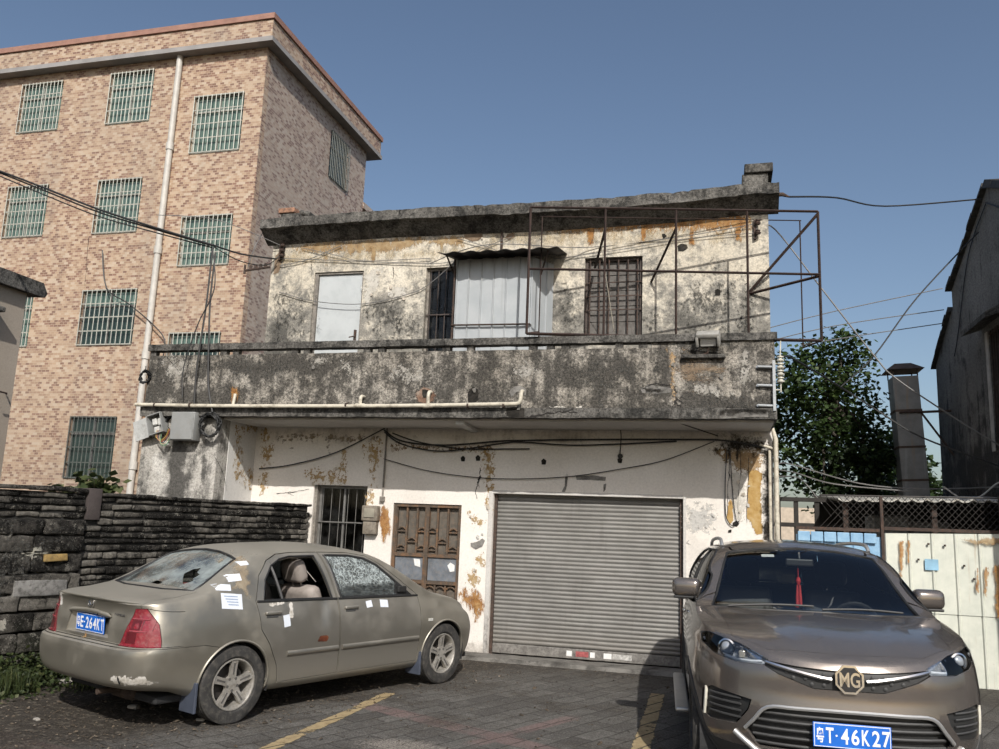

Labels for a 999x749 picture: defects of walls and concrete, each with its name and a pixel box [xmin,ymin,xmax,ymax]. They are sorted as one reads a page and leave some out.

damp [287,222,465,261]
rust [554,215,752,245]
damp [643,274,753,334]
damp [389,363,426,387]
damp [513,358,545,379]
peeling [304,449,348,486]
peeling [362,438,496,511]
spalling [681,447,764,535]
peeling [465,511,486,587]